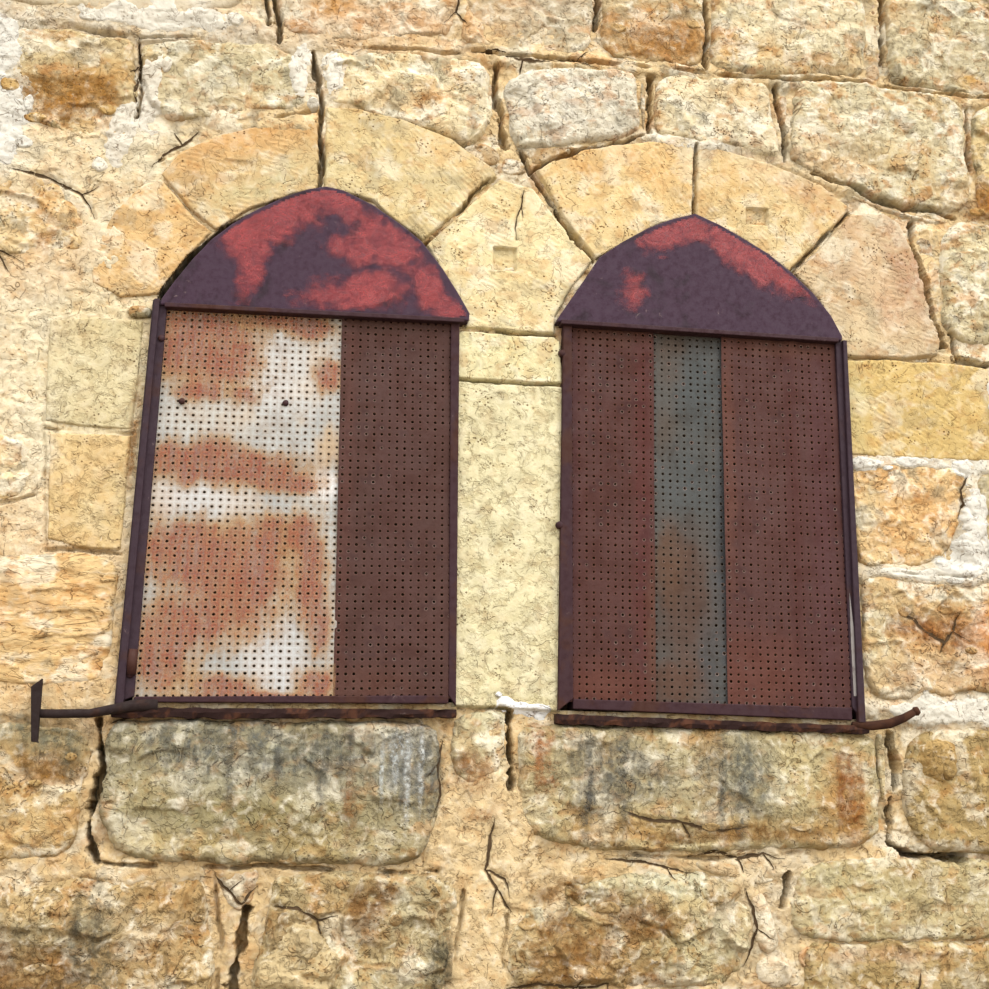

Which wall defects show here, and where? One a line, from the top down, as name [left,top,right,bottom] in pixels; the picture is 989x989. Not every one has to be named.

crack [9,167,99,219]
rust [162,310,334,403]
rust [312,358,341,395]
rust [153,435,325,495]
rust [136,512,334,696]
crack [484,820,511,916]